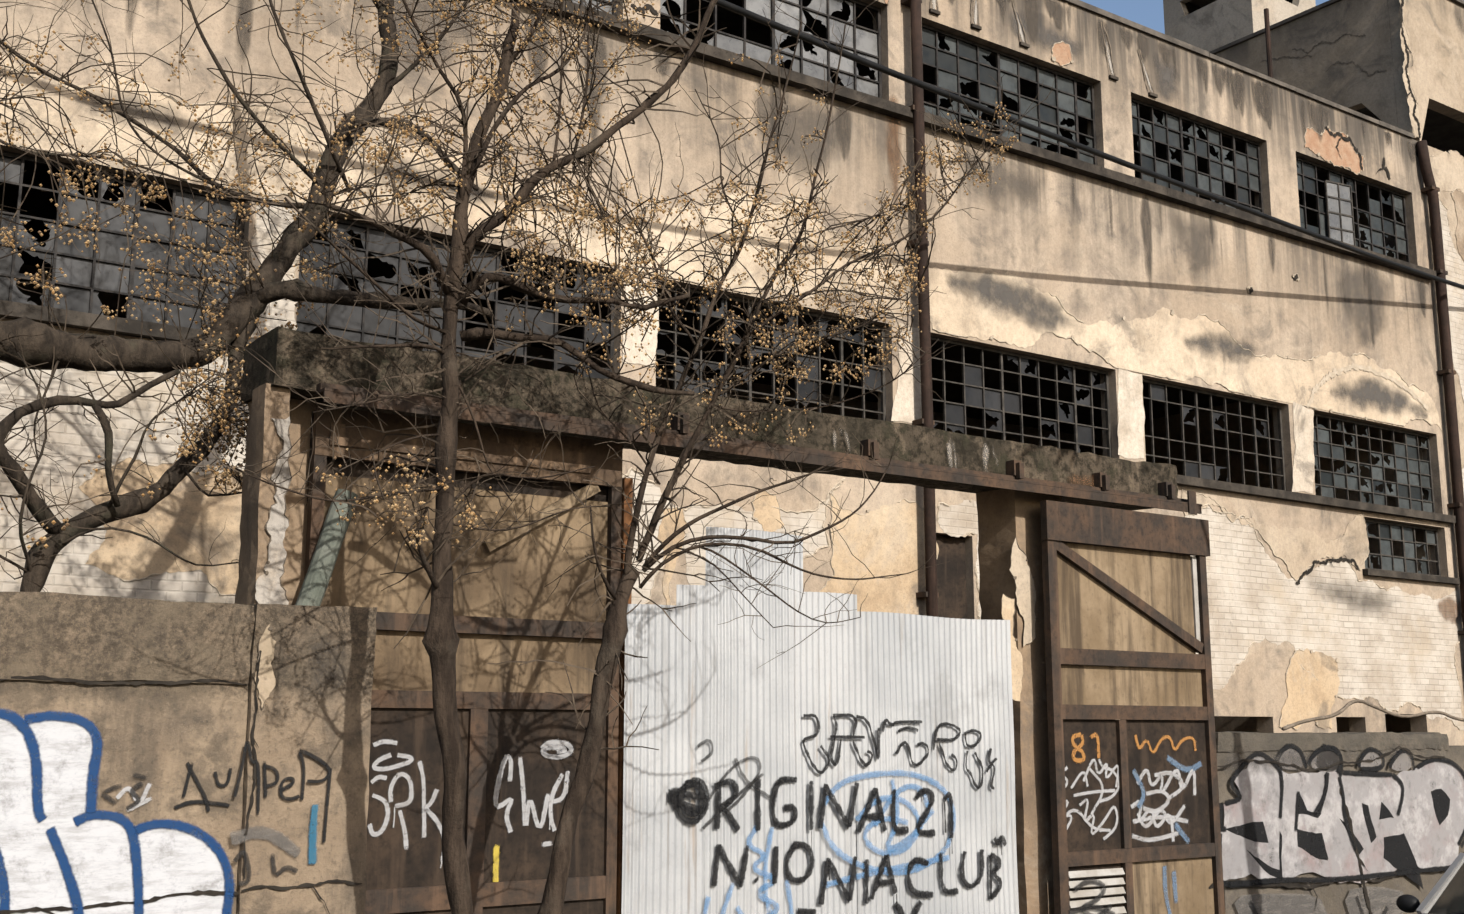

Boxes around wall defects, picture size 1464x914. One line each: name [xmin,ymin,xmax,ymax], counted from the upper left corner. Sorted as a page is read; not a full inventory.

water stain [238,0,252,54]
crack [1260,0,1421,138]
crack [1325,126,1391,180]
flaking render [329,141,1442,494]
water stain [951,276,1064,329]
water stain [1142,199,1152,276]
water stain [1187,336,1252,358]
flaking render [0,350,292,605]
flaking render [622,467,981,619]
flaking render [1181,489,1464,731]
crack [1296,557,1360,585]
crack [0,650,362,914]